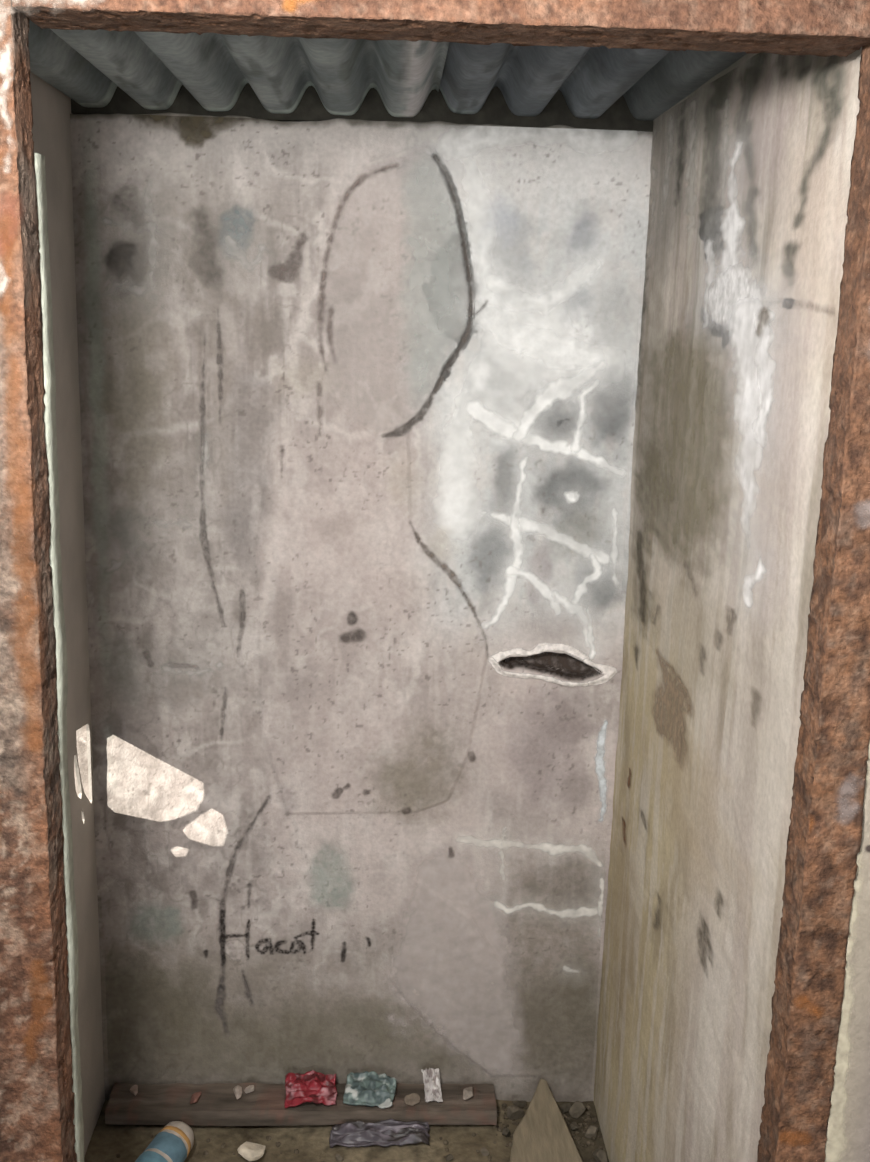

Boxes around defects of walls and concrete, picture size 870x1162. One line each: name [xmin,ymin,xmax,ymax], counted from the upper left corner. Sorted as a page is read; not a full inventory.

damp [799,55,841,158]
crack [318,166,390,419]
crack [385,156,484,437]
damp [651,53,785,532]
crack [415,532,479,623]
spalling [488,643,617,687]
damp [637,337,722,622]
damp [744,561,764,607]